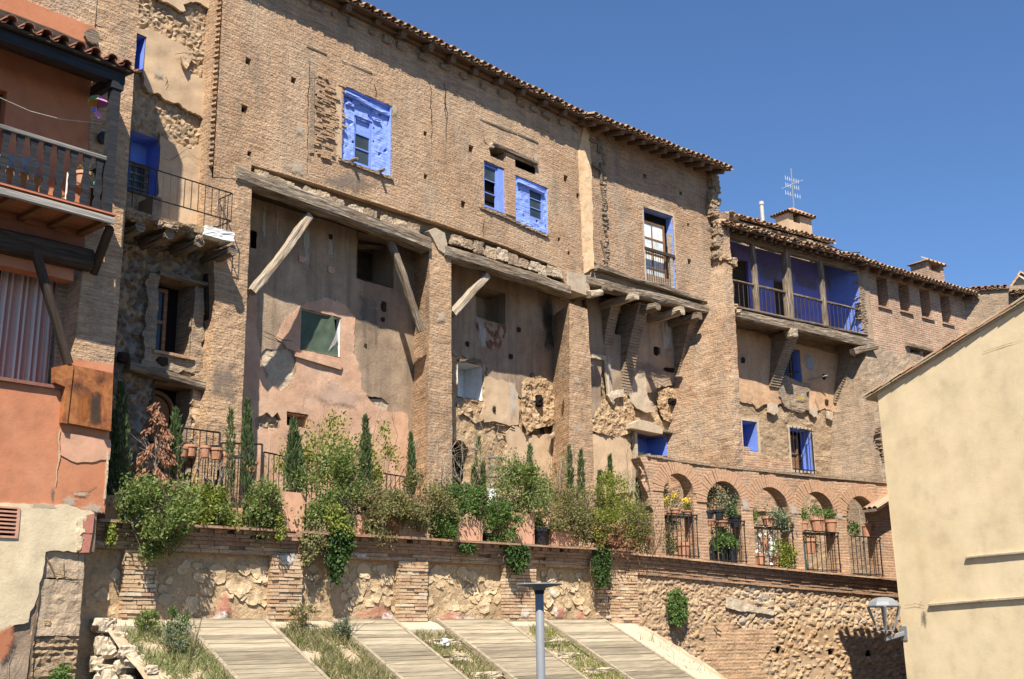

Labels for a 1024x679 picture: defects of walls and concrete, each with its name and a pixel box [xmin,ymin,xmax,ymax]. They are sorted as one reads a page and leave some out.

flaking render [180,53,194,70]
crack [429,82,448,143]
spalling [261,347,295,390]
corrosion [77,392,101,424]
spalling [457,398,496,423]
flaking render [605,389,624,403]
flaking render [767,403,779,415]
flaking render [806,392,833,420]
flaking render [33,450,109,550]